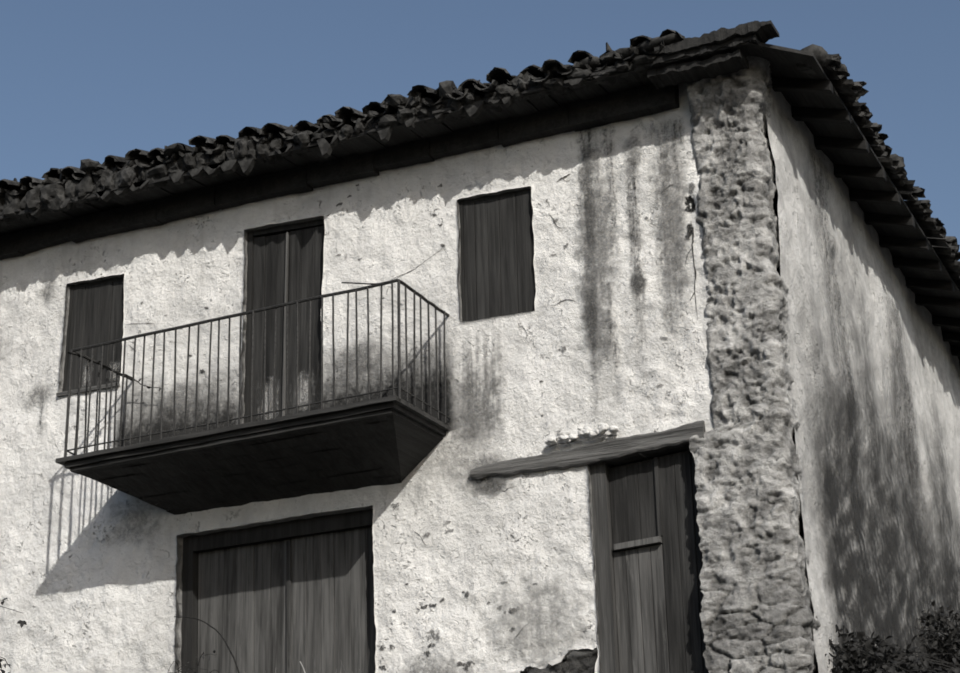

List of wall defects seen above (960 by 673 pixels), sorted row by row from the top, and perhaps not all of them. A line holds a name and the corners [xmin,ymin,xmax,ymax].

water stain [576,129,619,368]
water stain [627,137,647,328]
water stain [650,124,688,317]
flaking render [544,423,619,450]
flaking render [506,648,598,673]